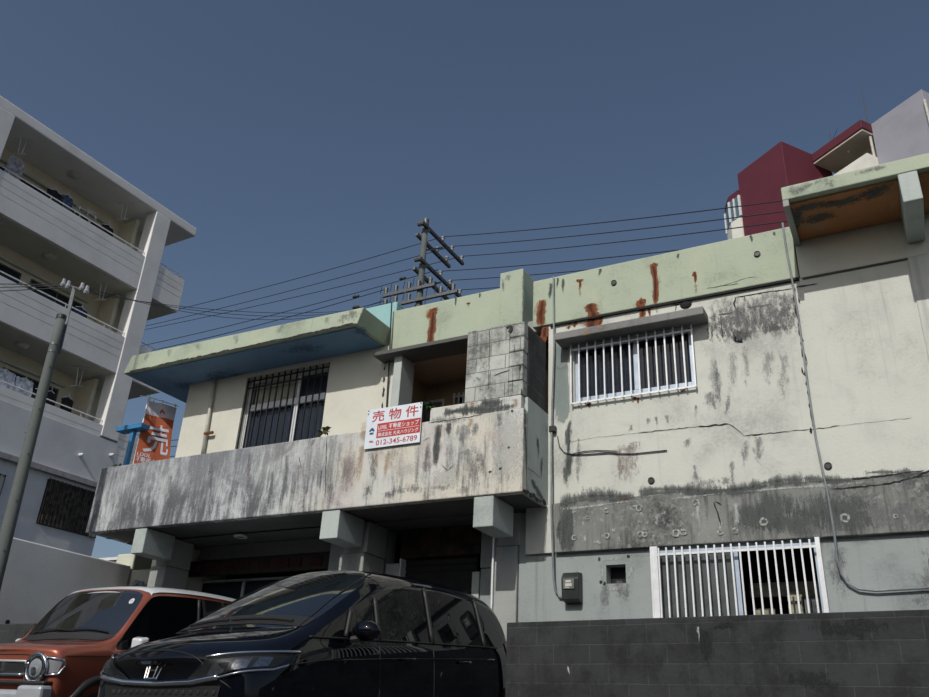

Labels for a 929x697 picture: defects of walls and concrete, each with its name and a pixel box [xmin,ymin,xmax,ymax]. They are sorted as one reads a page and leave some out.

water stain [792,183,893,228]
corrosion [427,307,437,342]
corrosion [535,300,549,342]
corrosion [567,303,603,329]
corrosion [636,263,659,318]
water stain [709,294,794,341]
crack [572,277,908,442]
water stain [424,398,513,474]
water stain [524,408,543,501]
water stain [554,343,579,482]
water stain [557,462,928,550]